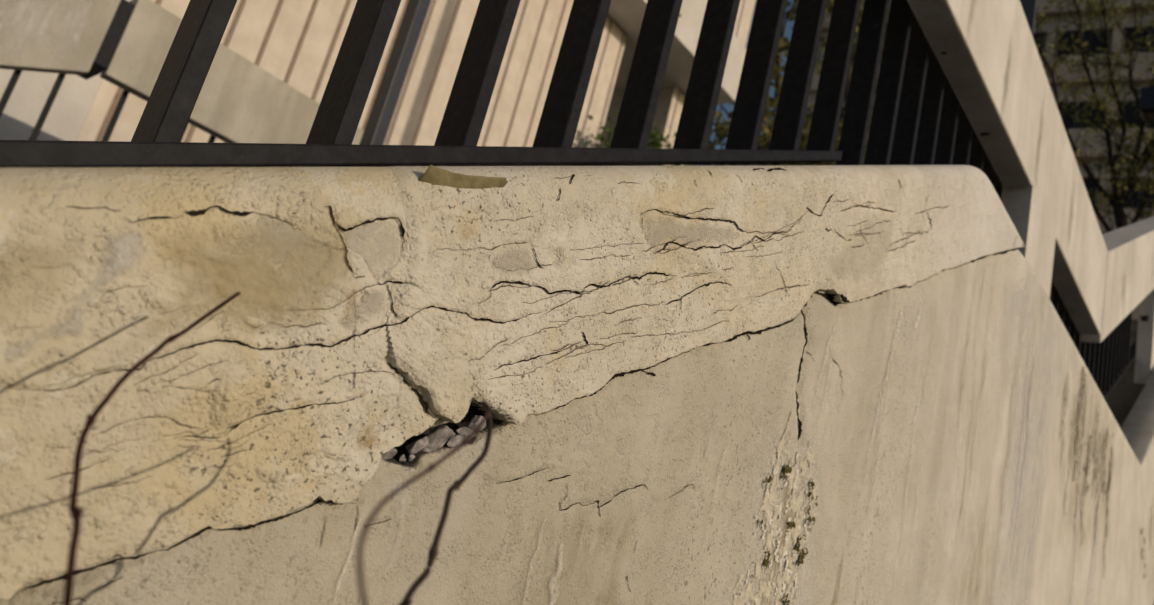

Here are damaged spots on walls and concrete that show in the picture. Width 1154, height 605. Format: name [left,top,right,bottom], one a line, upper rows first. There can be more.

crack [3,168,1018,489]
water stain [1061,368,1113,605]